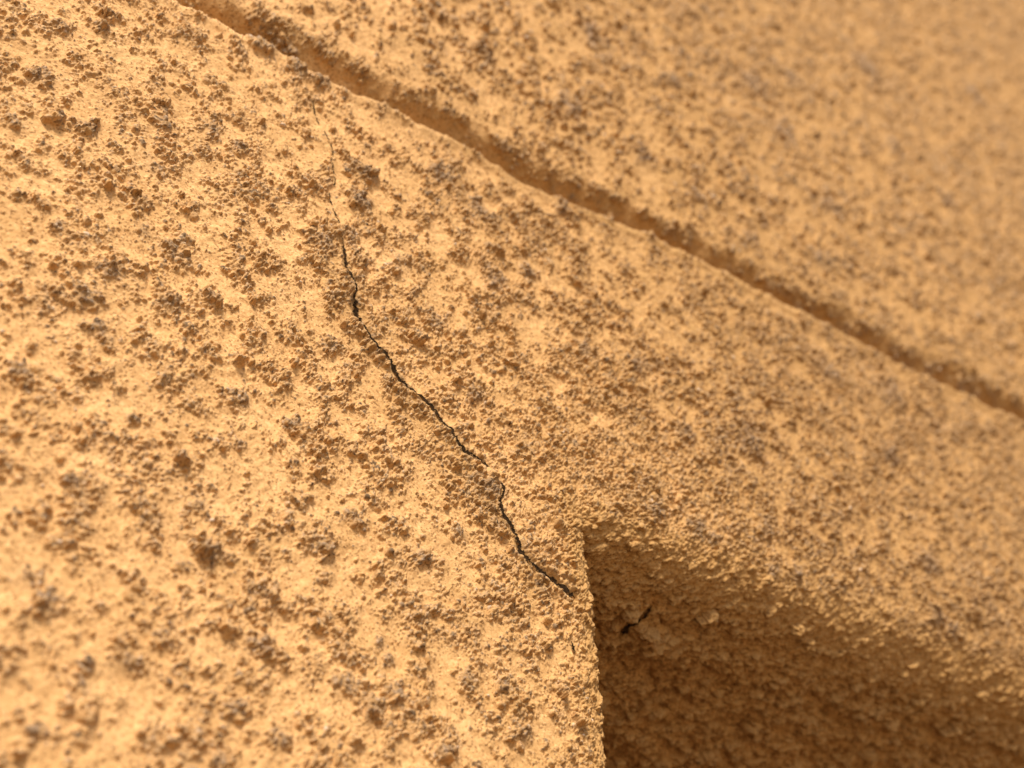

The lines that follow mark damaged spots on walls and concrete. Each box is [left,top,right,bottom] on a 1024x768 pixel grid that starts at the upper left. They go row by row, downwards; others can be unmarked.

crack [311,96,575,599]